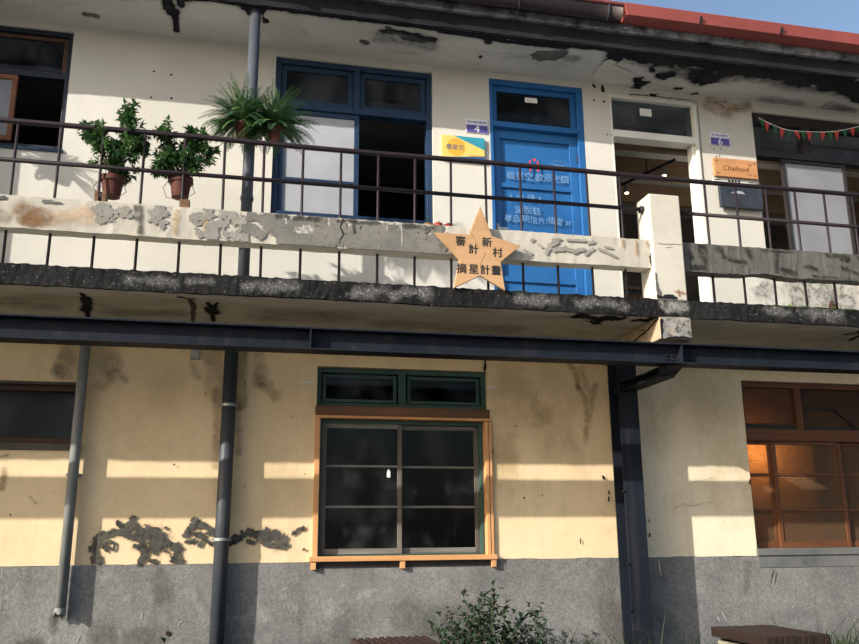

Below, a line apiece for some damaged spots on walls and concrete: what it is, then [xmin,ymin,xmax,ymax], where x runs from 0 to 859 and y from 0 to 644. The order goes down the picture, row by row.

flaking render [162,0,191,33]
flaking render [530,49,569,62]
flaking render [649,67,676,80]
rust [14,204,53,226]
peeling [90,201,133,225]
peeling [147,205,177,230]
peeling [189,208,453,255]
flaking render [79,293,93,317]
flaking render [204,302,220,322]
peeling [88,516,215,568]
peeling [229,526,305,550]